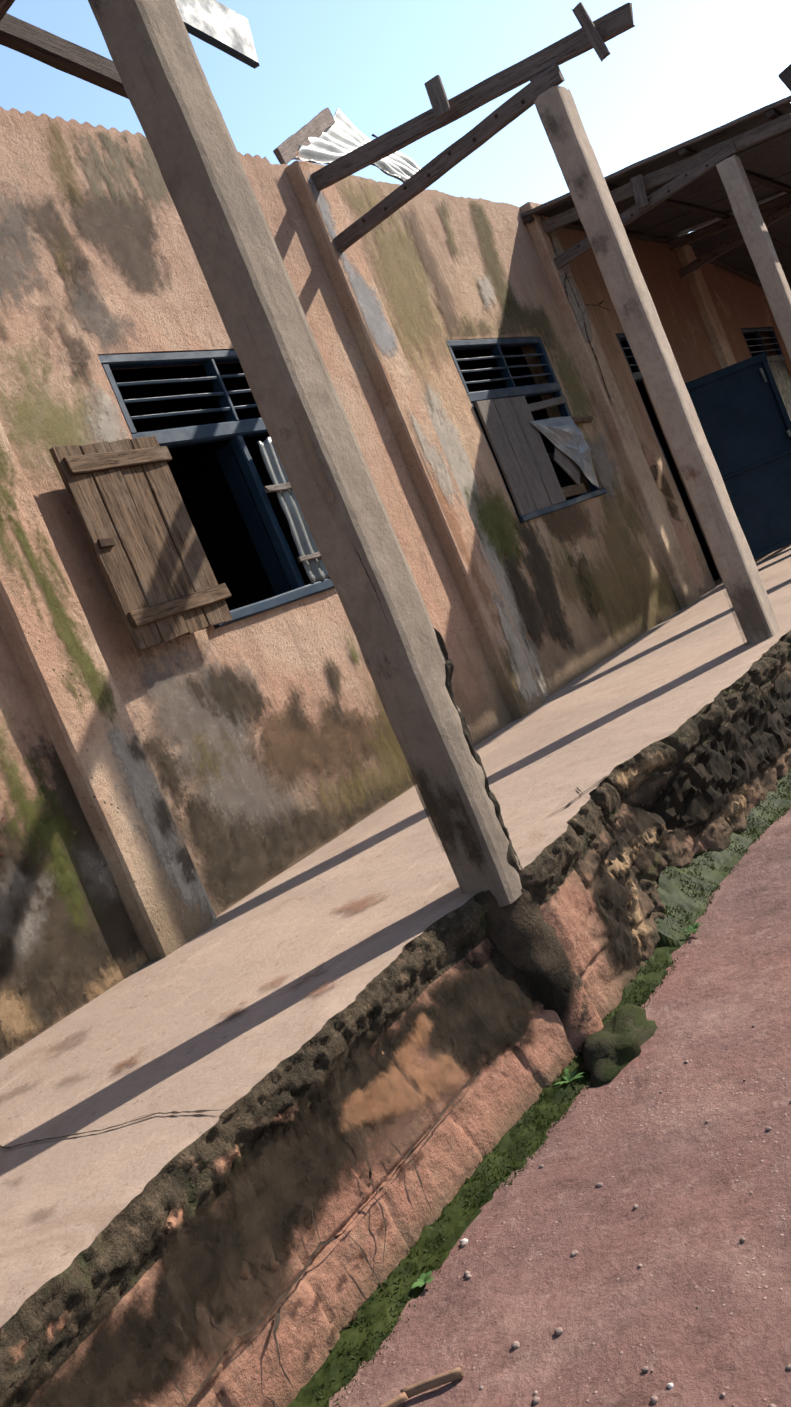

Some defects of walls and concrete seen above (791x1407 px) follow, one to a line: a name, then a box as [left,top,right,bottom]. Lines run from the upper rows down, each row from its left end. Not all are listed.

damp [0,132,171,384]
damp [405,200,460,336]
damp [0,516,116,721]
damp [501,504,601,652]
damp [130,641,483,906]
spalling [433,627,520,873]
damp [0,737,148,1057]
damp [340,896,380,914]
crack [0,1109,225,1149]
damp [11,940,542,1407]